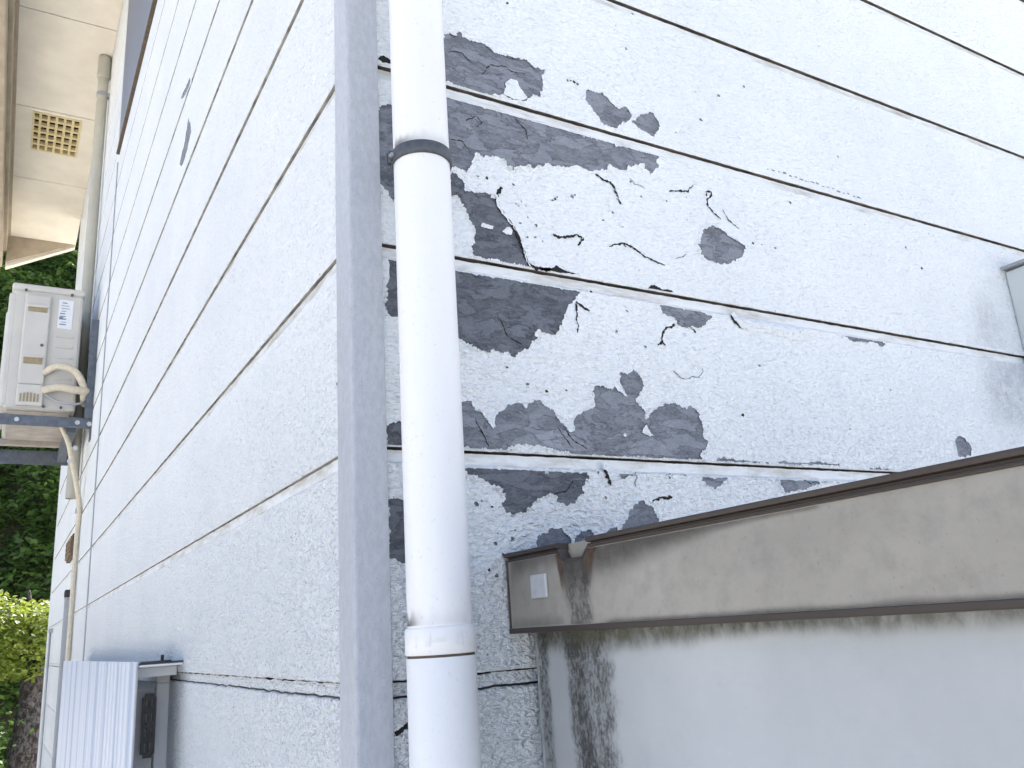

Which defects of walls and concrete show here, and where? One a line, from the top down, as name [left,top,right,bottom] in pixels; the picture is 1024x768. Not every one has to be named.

peeling [443,30,661,276]
crack [595,170,739,229]
crack [553,229,686,266]
peeling [694,222,777,268]
peeling [455,270,593,370]
crack [575,298,591,333]
crack [656,320,697,346]
crack [730,312,743,329]
peeling [461,368,840,468]
peeling [465,467,600,557]
water stain [562,527,704,768]
water stain [538,634,554,762]